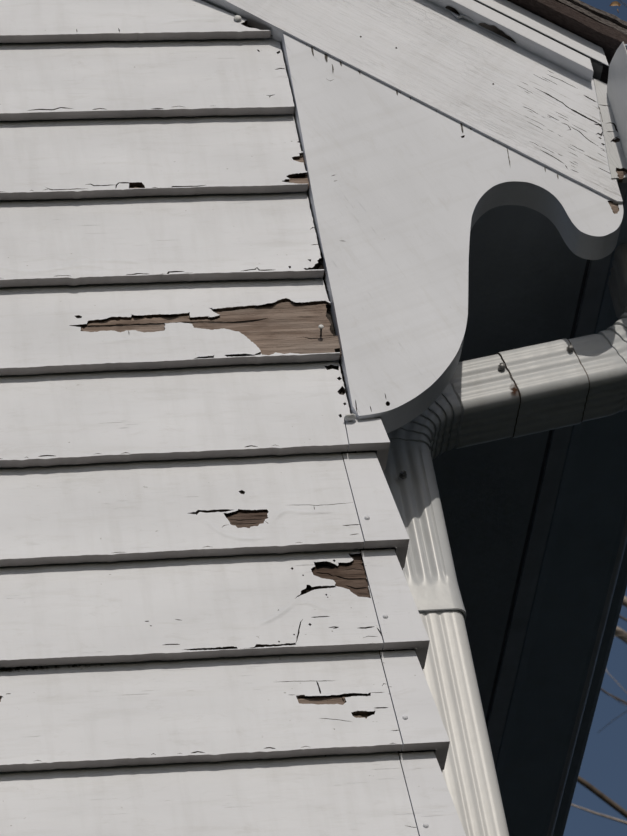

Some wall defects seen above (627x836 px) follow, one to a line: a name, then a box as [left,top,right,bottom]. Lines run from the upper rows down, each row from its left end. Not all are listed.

peeling [282,143,310,189]
peeling [76,299,342,370]
peeling [223,508,267,528]
peeling [312,552,370,598]
peeling [297,688,370,705]